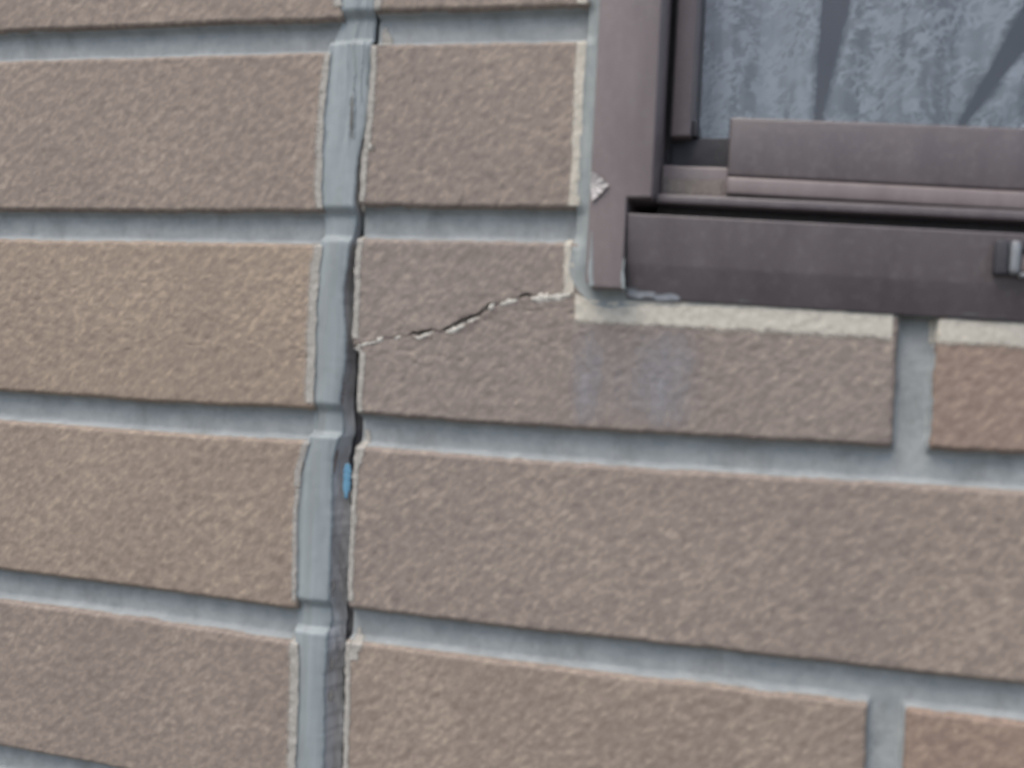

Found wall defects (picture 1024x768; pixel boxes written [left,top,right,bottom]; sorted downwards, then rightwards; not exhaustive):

crack [352,291,571,348]